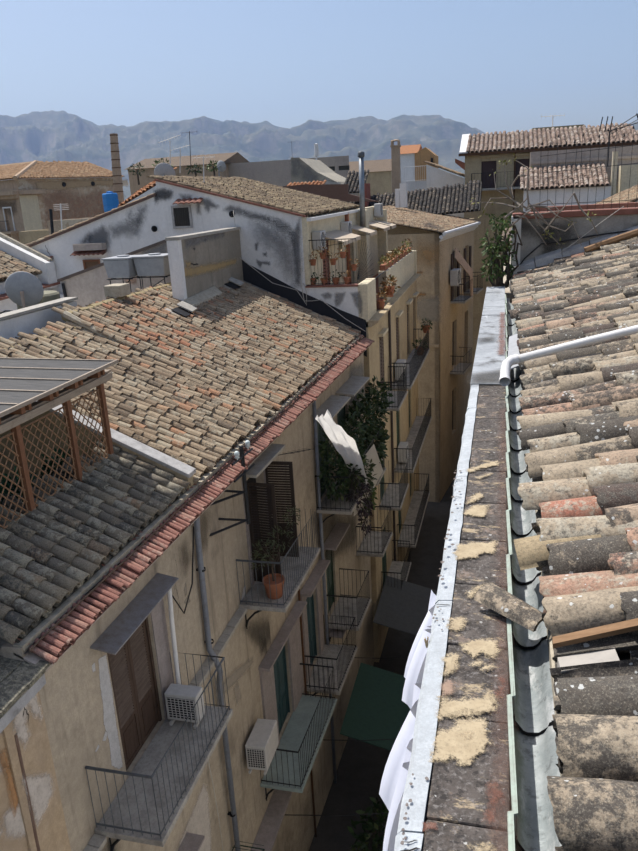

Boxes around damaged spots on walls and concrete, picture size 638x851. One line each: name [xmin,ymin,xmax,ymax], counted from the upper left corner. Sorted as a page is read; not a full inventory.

damp [155,190,171,199]
damp [83,208,145,244]
damp [185,233,224,246]
damp [227,207,300,283]